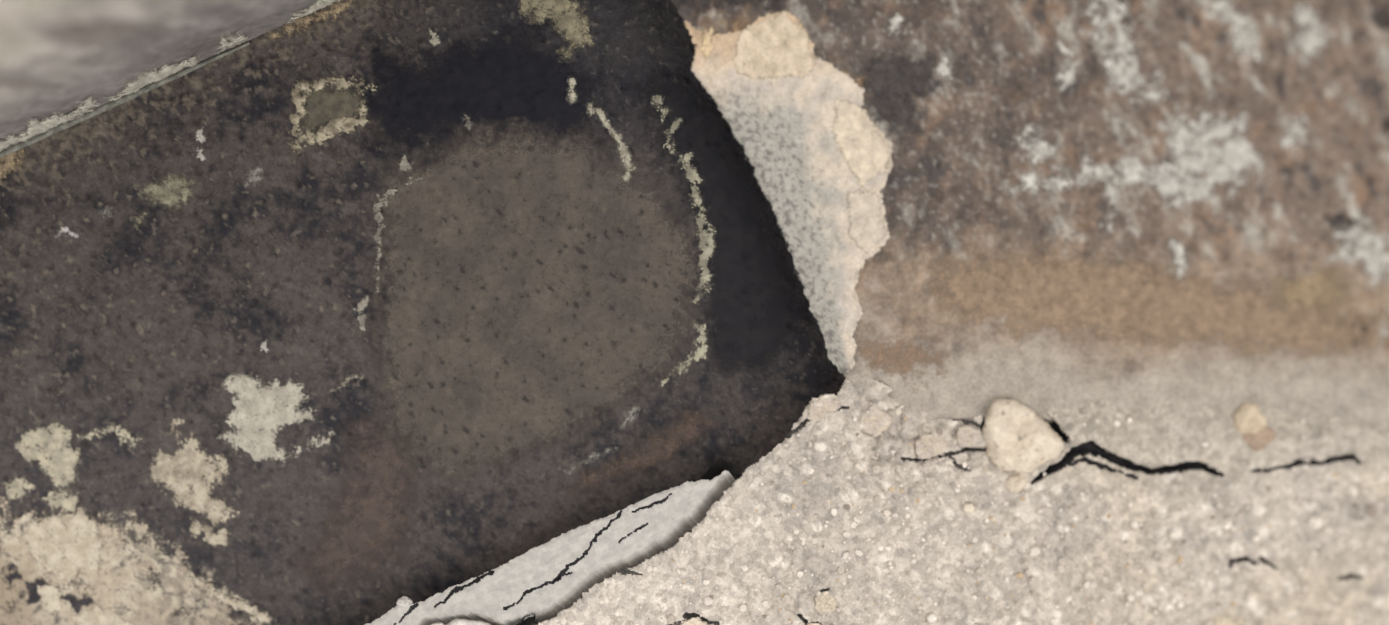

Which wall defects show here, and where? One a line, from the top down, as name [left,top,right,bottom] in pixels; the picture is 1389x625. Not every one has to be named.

leakage [287,0,340,24]
leakage [299,89,362,133]
leakage [568,78,636,180]
leakage [651,94,716,303]
spalling [685,11,893,374]
leakage [353,155,422,331]
leakage [661,320,708,387]
leakage [620,407,640,428]
crack [901,398,1008,471]
crack [1031,414,1361,484]
peeling [0,374,335,625]